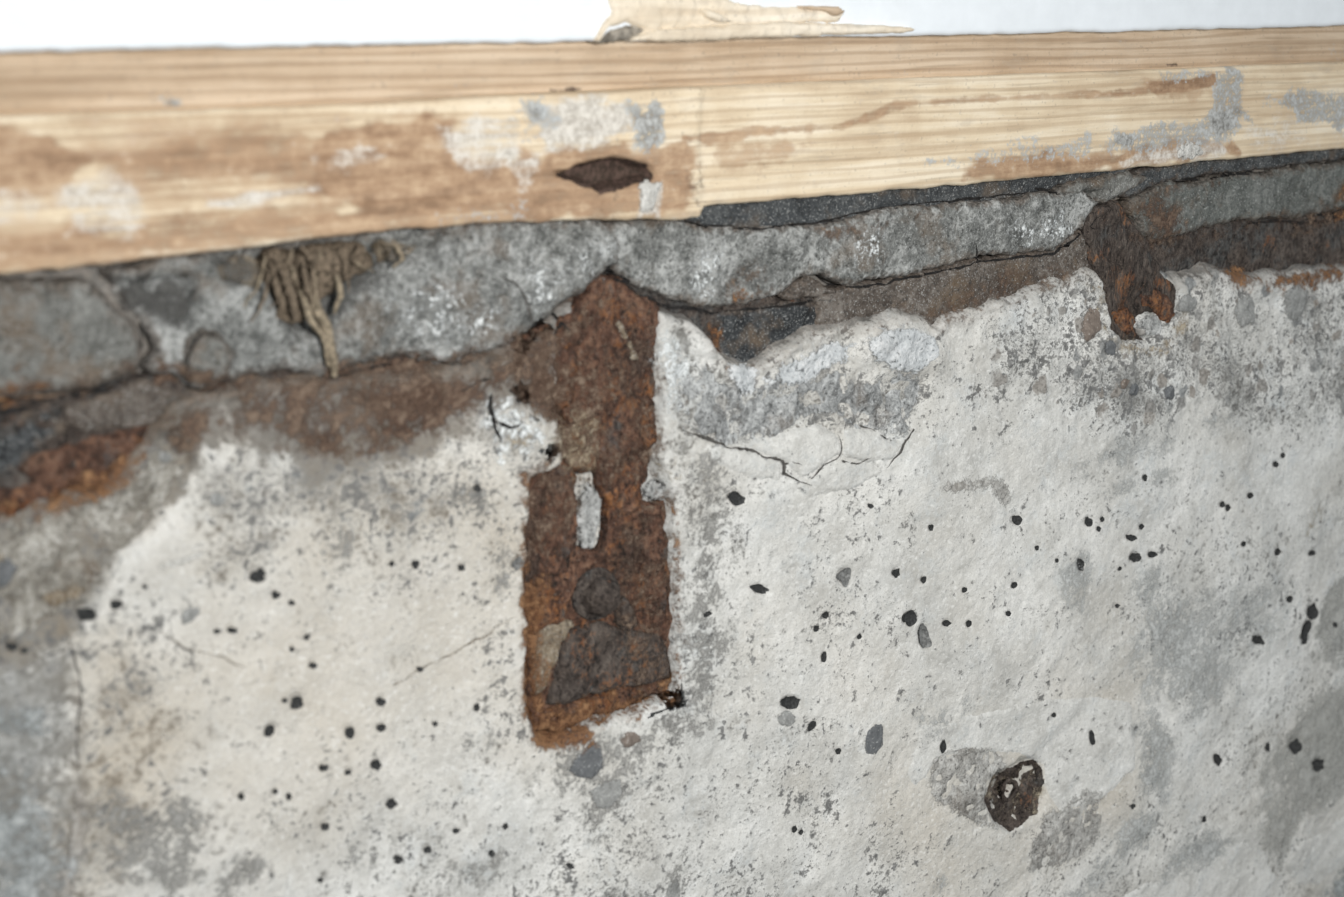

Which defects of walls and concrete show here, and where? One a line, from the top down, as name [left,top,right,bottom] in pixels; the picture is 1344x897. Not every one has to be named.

corrosion [4,441,147,520]
crack [683,425,915,485]
corrosion [154,293,684,751]